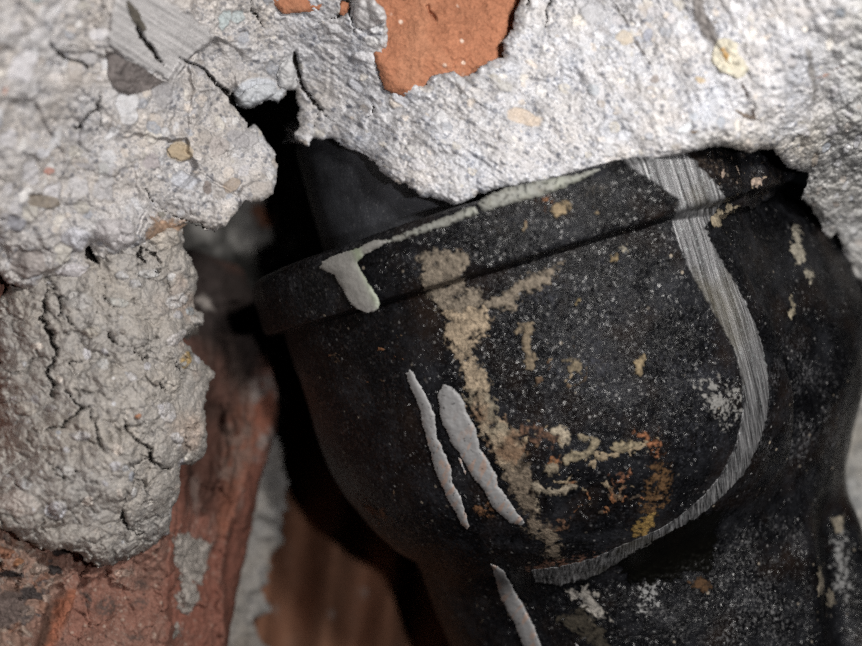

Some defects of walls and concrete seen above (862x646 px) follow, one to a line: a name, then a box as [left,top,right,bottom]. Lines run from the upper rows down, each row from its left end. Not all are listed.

crack [136,248,161,274]
crack [38,246,149,450]
crack [120,425,172,536]